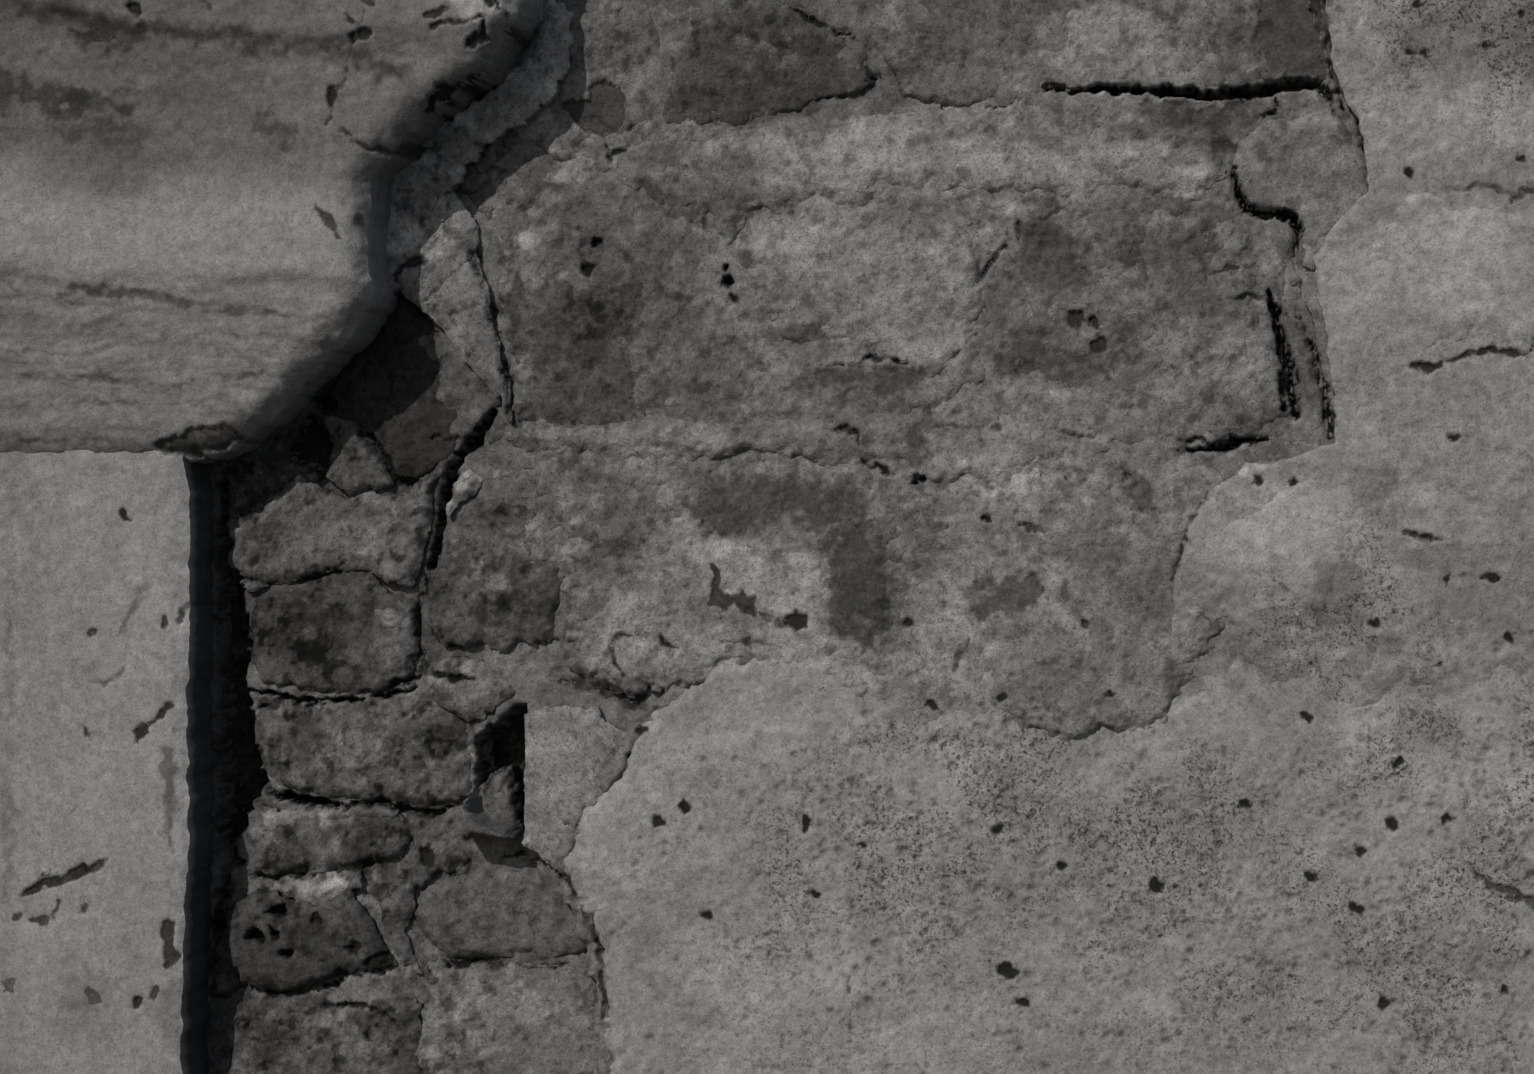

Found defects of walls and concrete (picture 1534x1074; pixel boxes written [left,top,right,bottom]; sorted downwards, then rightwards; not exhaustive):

crack [324,0,530,159]
spalling [561,78,625,137]
crack [1048,82,1332,116]
spalling [1254,0,1363,159]
spalling [722,265,738,302]
spalling [1068,310,1107,353]
crack [1410,343,1534,374]
spalling [708,564,807,631]
spalling [550,684,689,1074]
spalling [1149,877,1164,893]
spalling [335,941,395,981]
spalling [997,962,1020,979]